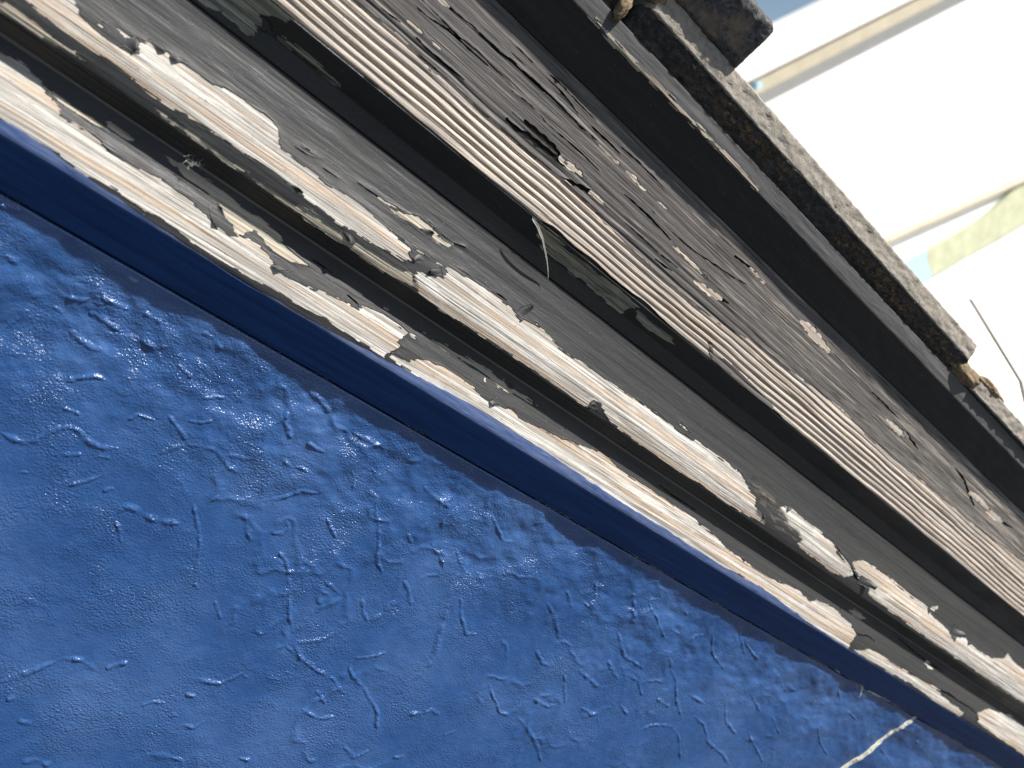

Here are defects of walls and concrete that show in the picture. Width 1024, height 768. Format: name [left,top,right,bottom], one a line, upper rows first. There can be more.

peeling [0,0,857,648]
peeling [779,505,1024,703]
peeling [855,649,964,717]
peeling [976,708,1024,755]